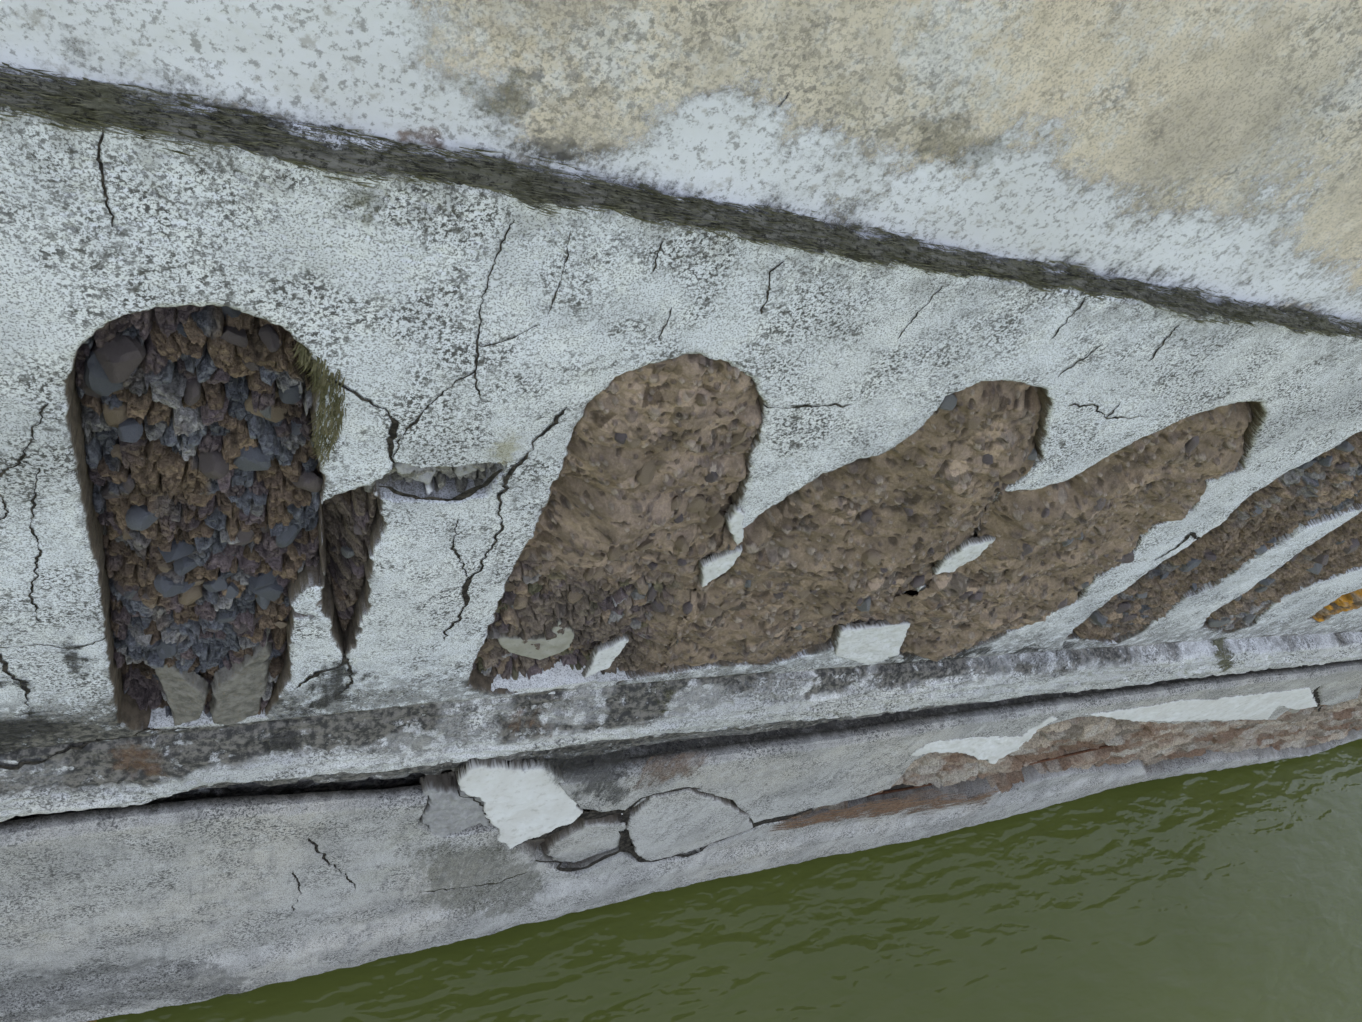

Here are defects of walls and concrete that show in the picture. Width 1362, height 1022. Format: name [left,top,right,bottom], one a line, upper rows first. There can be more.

water stain [352,190,379,222]
crack [321,220,571,640]
crack [0,404,107,707]
spalling [792,687,1362,820]
crack [292,838,356,911]
crack [426,787,812,892]
rust [773,788,1000,835]